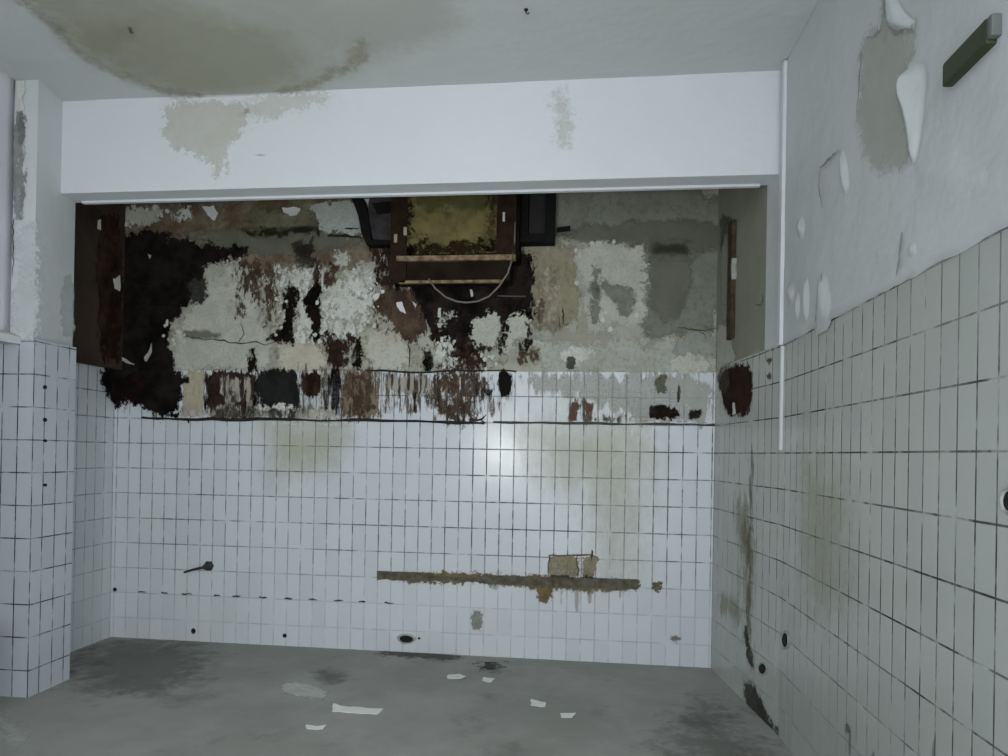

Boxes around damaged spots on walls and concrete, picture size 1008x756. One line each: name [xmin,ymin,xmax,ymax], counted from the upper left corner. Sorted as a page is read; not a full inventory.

spalling [12,80,28,273]
peeling [125,204,218,228]
spalling [162,199,737,377]
peeling [856,0,927,177]
rust [398,550,663,604]
water stain [742,519,779,736]